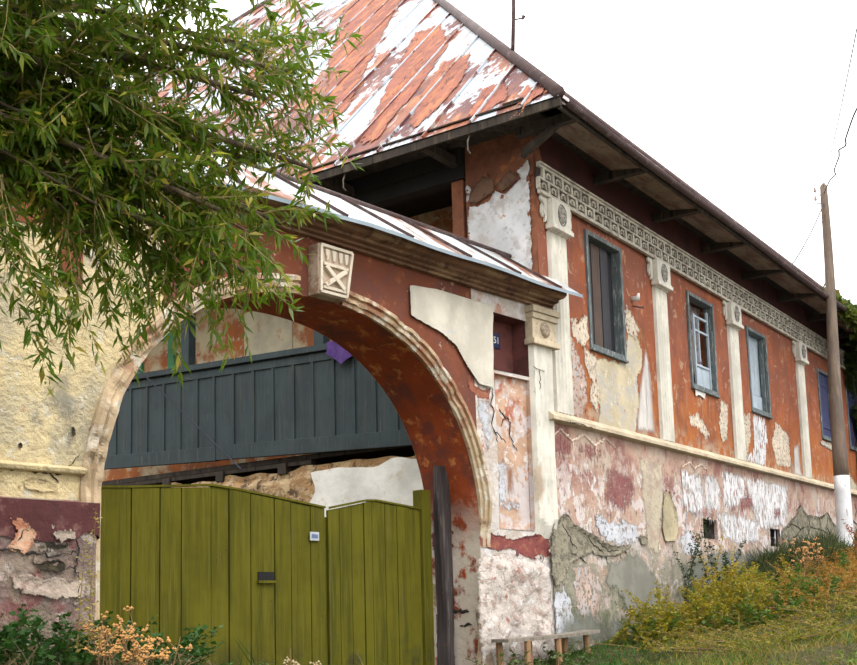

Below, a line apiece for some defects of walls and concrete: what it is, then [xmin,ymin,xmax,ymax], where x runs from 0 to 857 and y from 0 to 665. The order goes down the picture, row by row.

corrosion [324,0,400,123]
corrosion [359,24,471,145]
corrosion [465,83,547,123]
peeling [465,160,534,270]
crack [490,388,517,450]
peeling [570,304,642,432]
peeling [0,513,88,605]
spalling [479,458,837,633]